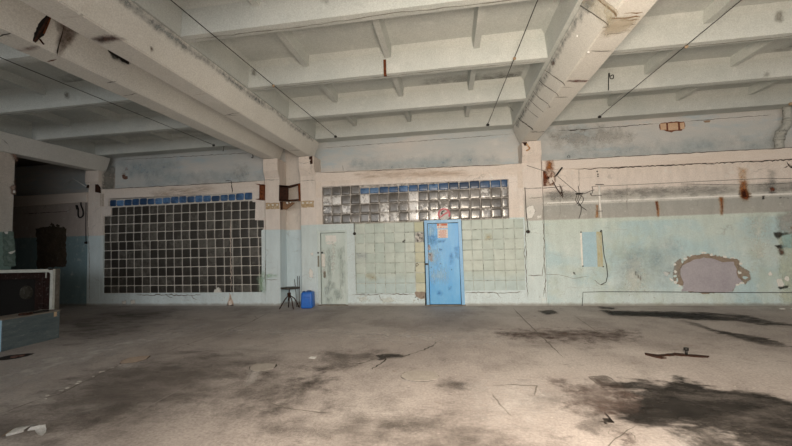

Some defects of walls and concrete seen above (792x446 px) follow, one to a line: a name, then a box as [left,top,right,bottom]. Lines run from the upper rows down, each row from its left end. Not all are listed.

flaking render [659,121,685,132]
spalling [663,252,751,294]